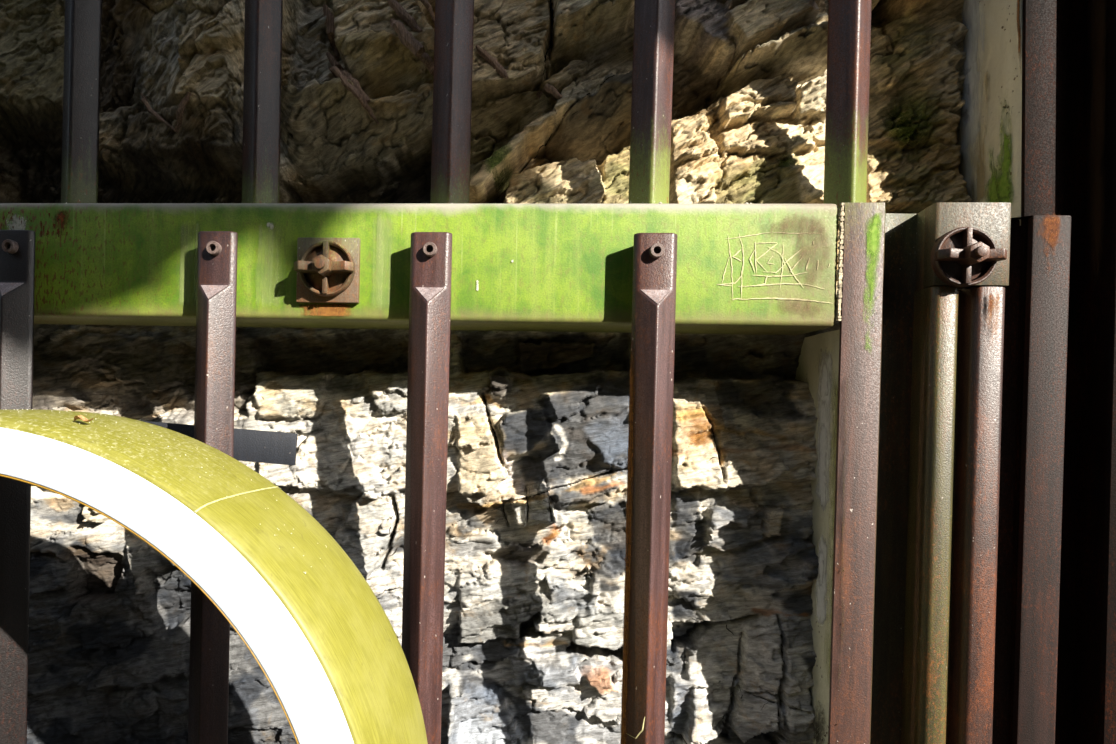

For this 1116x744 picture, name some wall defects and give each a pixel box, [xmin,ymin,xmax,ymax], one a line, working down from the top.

corrosion [1043,216,1060,256]